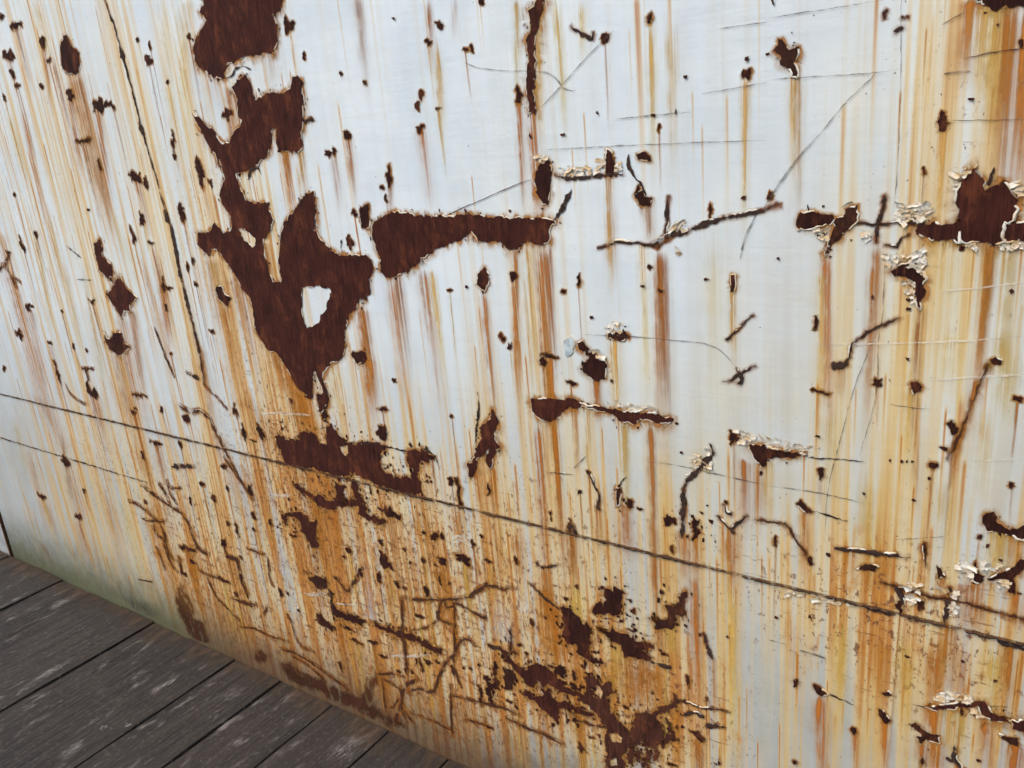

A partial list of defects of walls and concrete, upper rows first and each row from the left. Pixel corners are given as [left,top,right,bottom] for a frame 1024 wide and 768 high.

rust [414,89,426,157]
rust [645,11,662,152]
peeling [93,237,139,363]
peeling [192,0,679,657]
rust [498,271,519,369]
peeling [883,165,1024,366]
peeling [733,429,864,497]
rust [281,454,559,744]
peeling [479,576,702,727]
rust [569,615,730,768]
rust [879,580,1024,673]
peeling [936,511,1024,618]